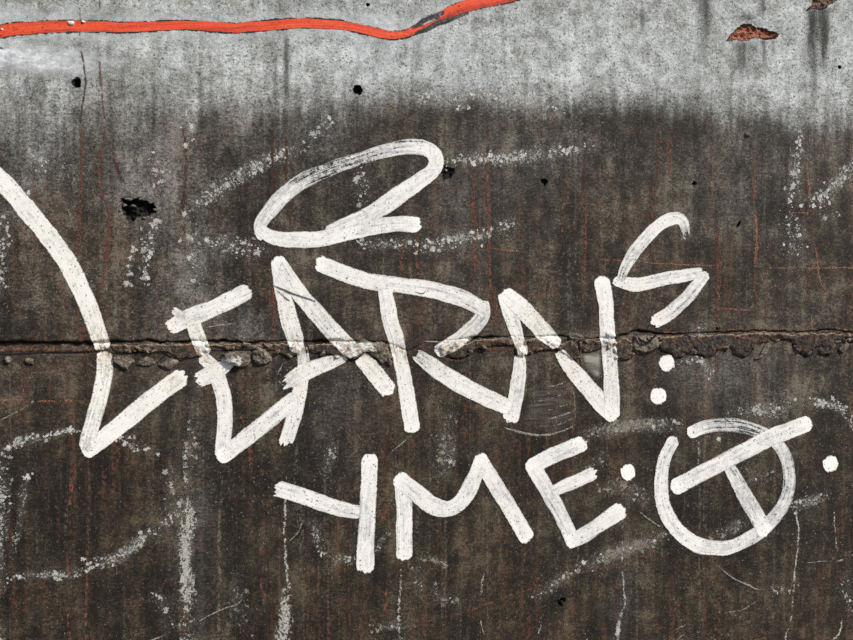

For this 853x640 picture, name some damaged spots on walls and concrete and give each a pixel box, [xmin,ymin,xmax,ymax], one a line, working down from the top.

crack [0,329,853,366]